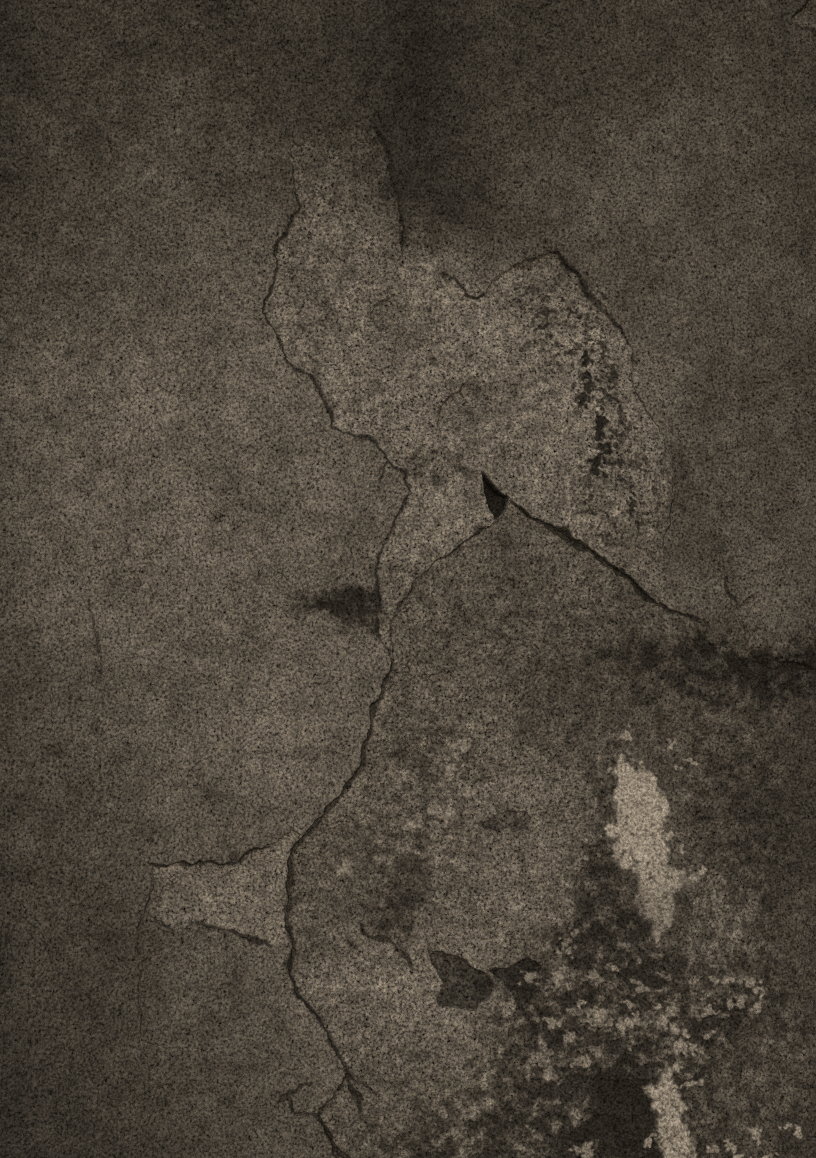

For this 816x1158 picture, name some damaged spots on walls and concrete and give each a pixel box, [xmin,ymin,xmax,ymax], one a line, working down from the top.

crack [791,0,816,41]
crack [368,124,407,252]
crack [552,251,671,458]
crack [144,144,489,1158]
spalling [135,117,816,1158]
crack [508,499,712,627]
crack [663,490,675,537]
crack [723,575,756,608]
crack [730,649,816,675]
water stain [331,603,816,1158]